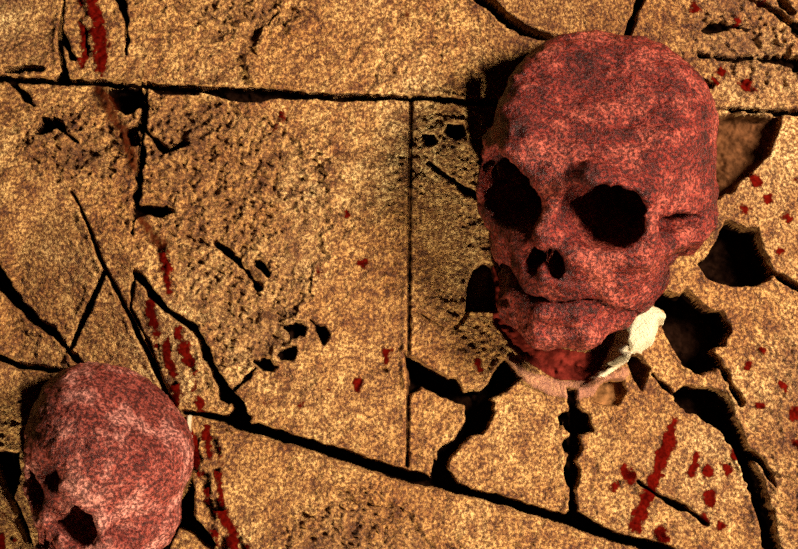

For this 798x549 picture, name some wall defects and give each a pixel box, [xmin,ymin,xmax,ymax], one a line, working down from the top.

crack [58,28,77,61]
crack [117,0,130,53]
crack [473,0,550,41]
crack [625,0,643,36]
crack [767,2,798,38]
crack [719,108,798,117]
crack [0,58,673,549]
crack [773,275,798,292]
crack [659,352,777,549]
crack [638,483,708,525]